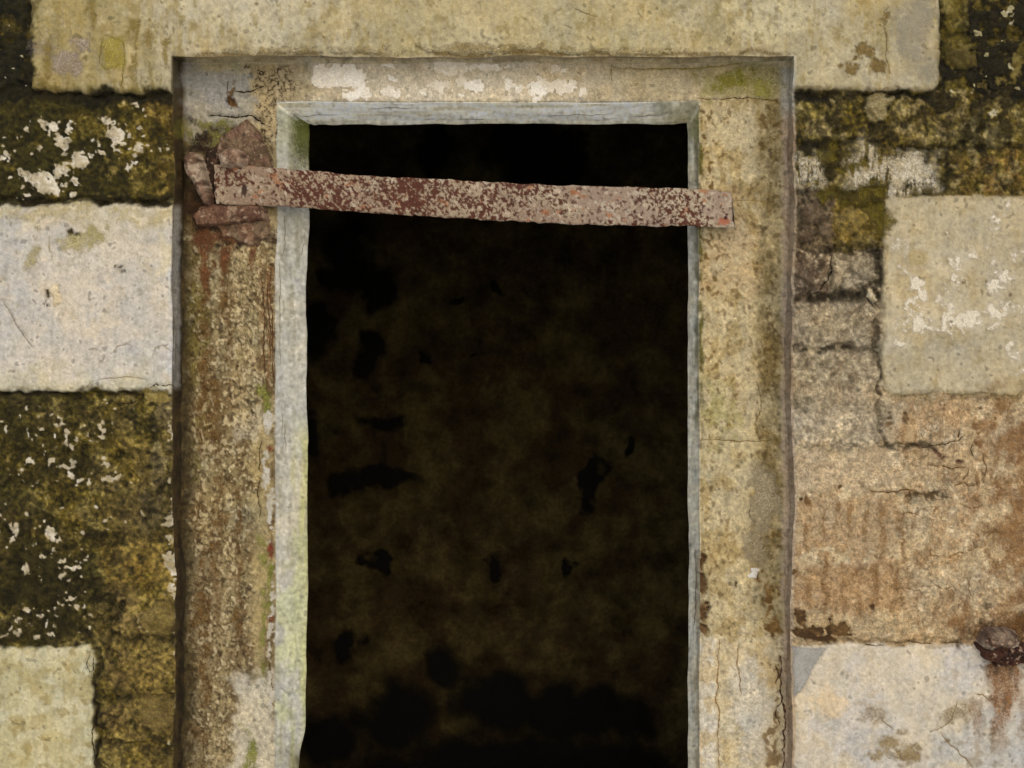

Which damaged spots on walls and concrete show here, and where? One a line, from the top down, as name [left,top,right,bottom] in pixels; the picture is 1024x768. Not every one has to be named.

rust [188,118,236,168]
rust [183,181,277,295]
crack [810,248,833,296]
crack [895,430,987,509]
crack [896,531,1000,599]
crack [715,640,742,768]
crack [775,656,786,768]
rust [986,661,1023,730]